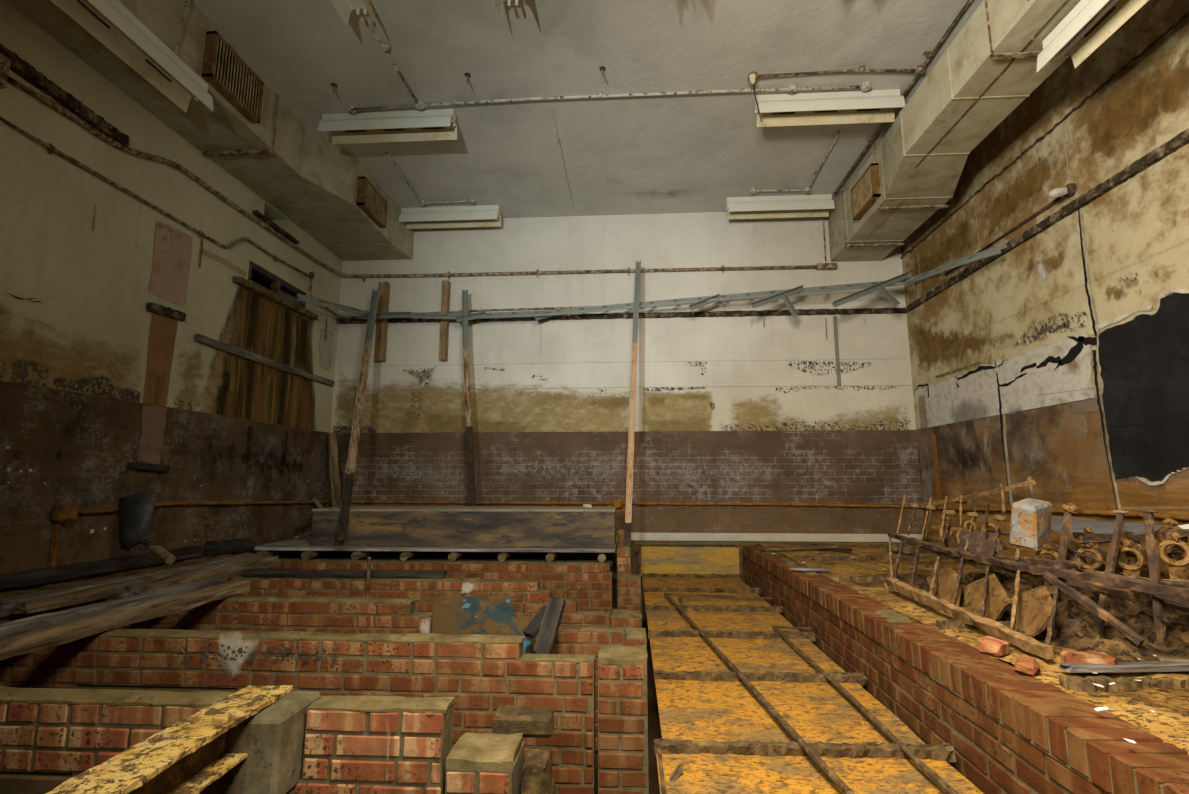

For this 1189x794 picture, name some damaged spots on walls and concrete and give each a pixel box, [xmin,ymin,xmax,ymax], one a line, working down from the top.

corrosion [1088,47,1189,156]
corrosion [986,159,1055,235]
corrosion [910,220,971,285]
corrosion [1028,251,1064,280]
damp [0,307,140,402]
damp [333,368,629,433]
damp [643,361,910,431]
crack [914,208,1121,510]
mould [1015,312,1087,346]
flaking render [915,288,1189,486]